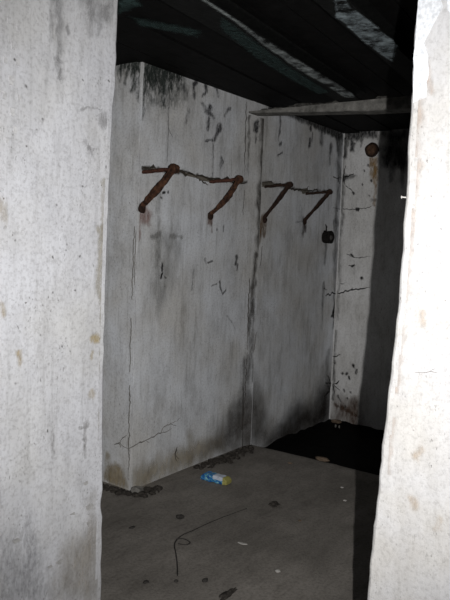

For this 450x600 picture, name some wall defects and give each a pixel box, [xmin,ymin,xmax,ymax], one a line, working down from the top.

water stain [119,62,208,106]
water stain [248,116,264,171]
crack [130,227,138,296]
crack [324,283,369,296]
crack [114,386,180,480]